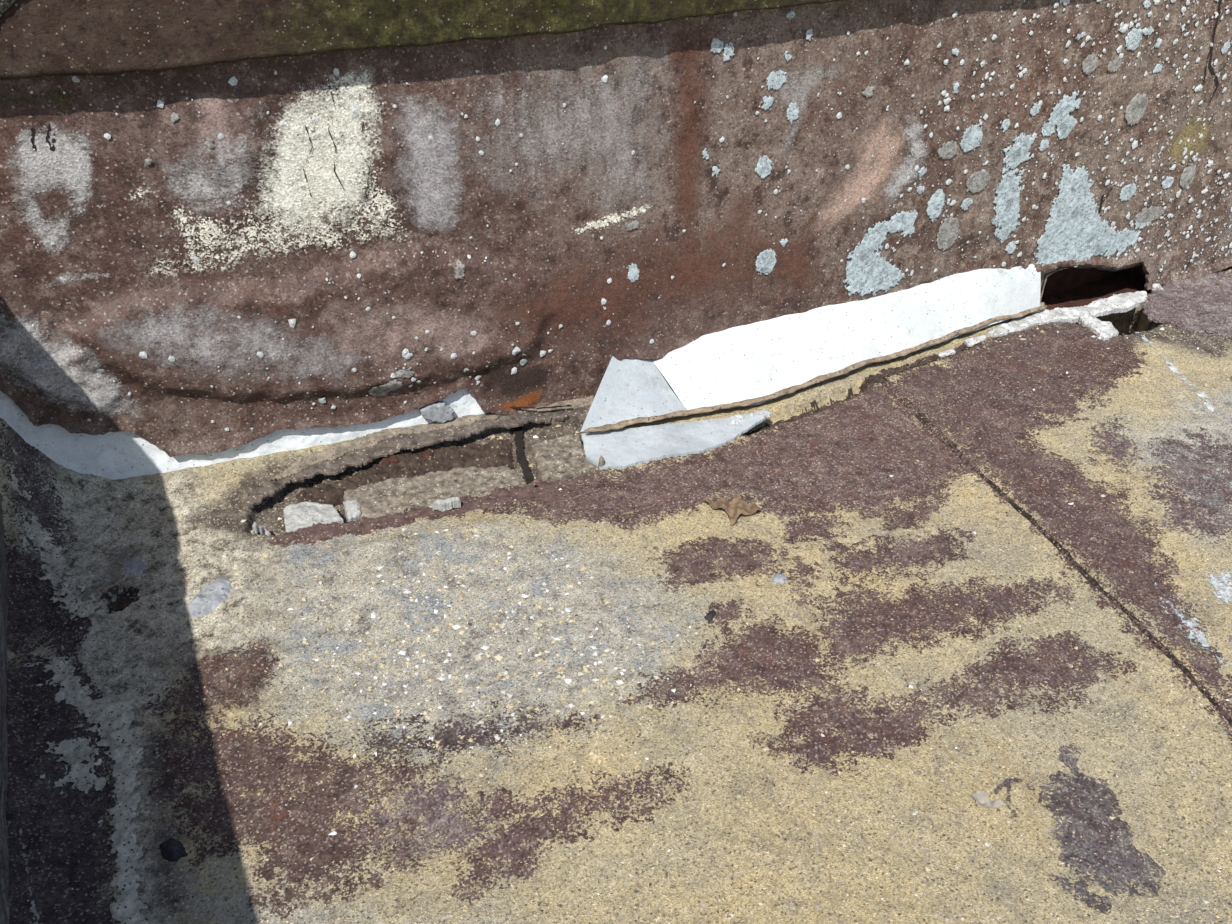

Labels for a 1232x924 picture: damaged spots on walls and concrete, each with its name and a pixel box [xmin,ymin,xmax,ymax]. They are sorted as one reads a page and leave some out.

leakage [7,124,92,252]
leakage [151,69,460,274]
peeling [0,388,514,924]
peeling [142,638,698,919]
peeling [439,265,1232,780]